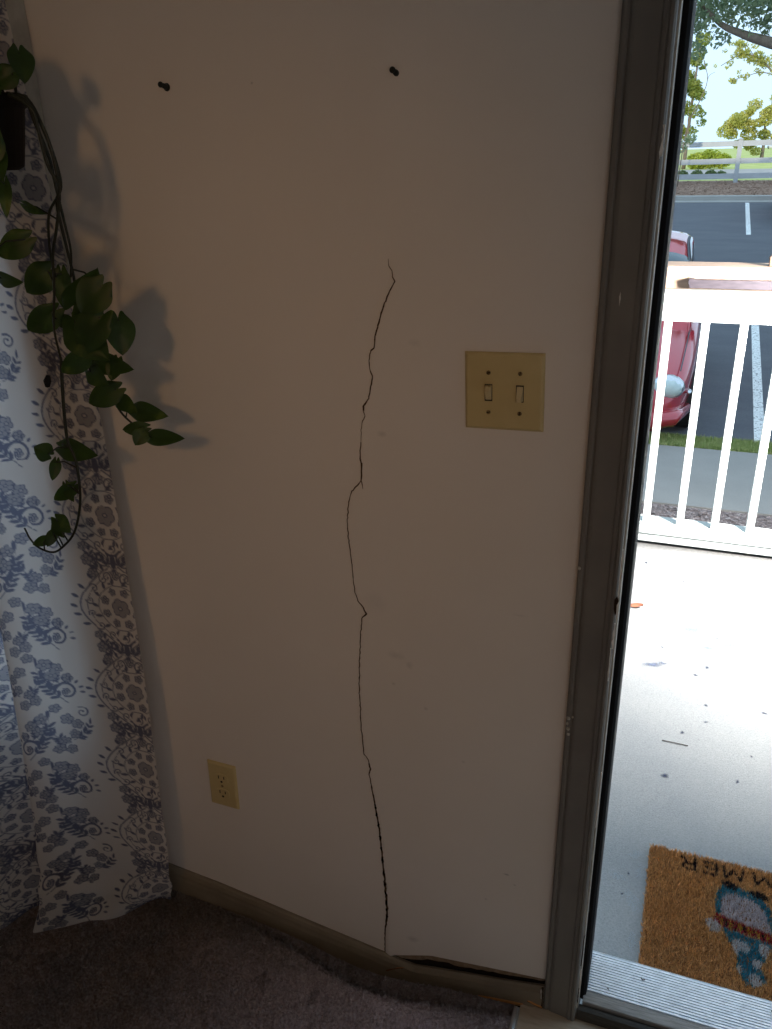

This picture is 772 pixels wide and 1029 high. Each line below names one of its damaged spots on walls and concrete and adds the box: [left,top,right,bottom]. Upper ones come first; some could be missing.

crack [347,260,402,971]